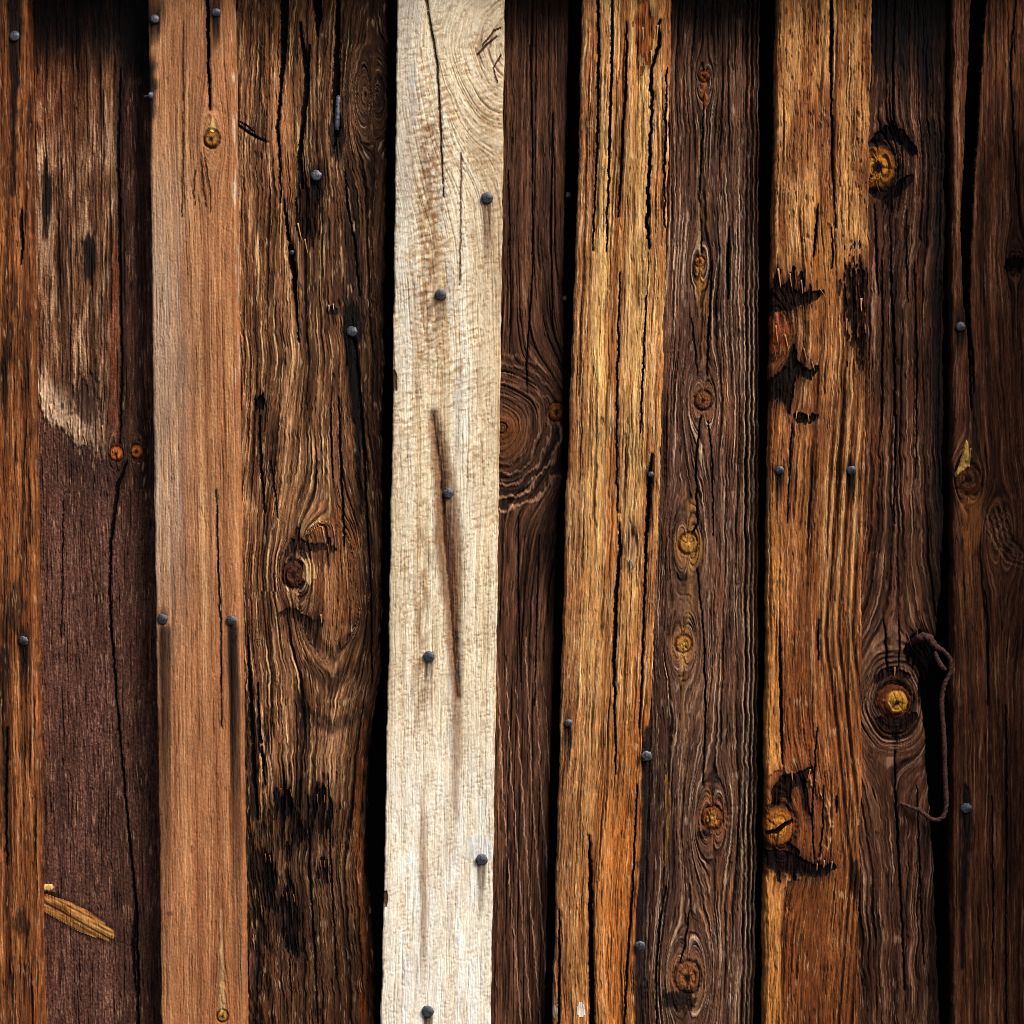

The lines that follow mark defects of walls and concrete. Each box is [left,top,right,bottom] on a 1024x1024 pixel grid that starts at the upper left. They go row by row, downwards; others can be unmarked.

crack [238,0,341,343]
crack [344,171,361,297]
crack [425,0,462,285]
crack [108,69,140,1024]
crack [592,0,668,1024]
crack [587,835,595,1024]